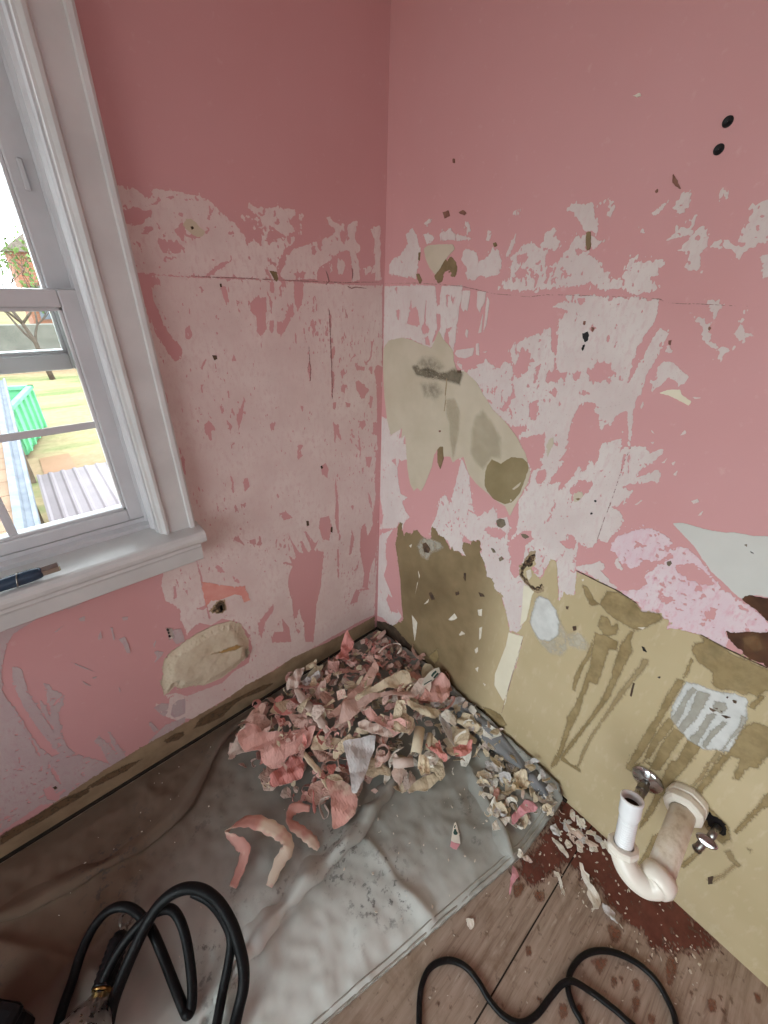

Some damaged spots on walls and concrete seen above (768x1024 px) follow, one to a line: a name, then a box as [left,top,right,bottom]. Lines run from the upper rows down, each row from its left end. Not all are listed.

crack [196,268,396,289]
peeling [117,174,768,743]
peeling [0,619,132,833]
damp [551,585,661,772]
damp [638,833,658,865]
damp [626,638,768,834]
spalling [704,808,730,844]